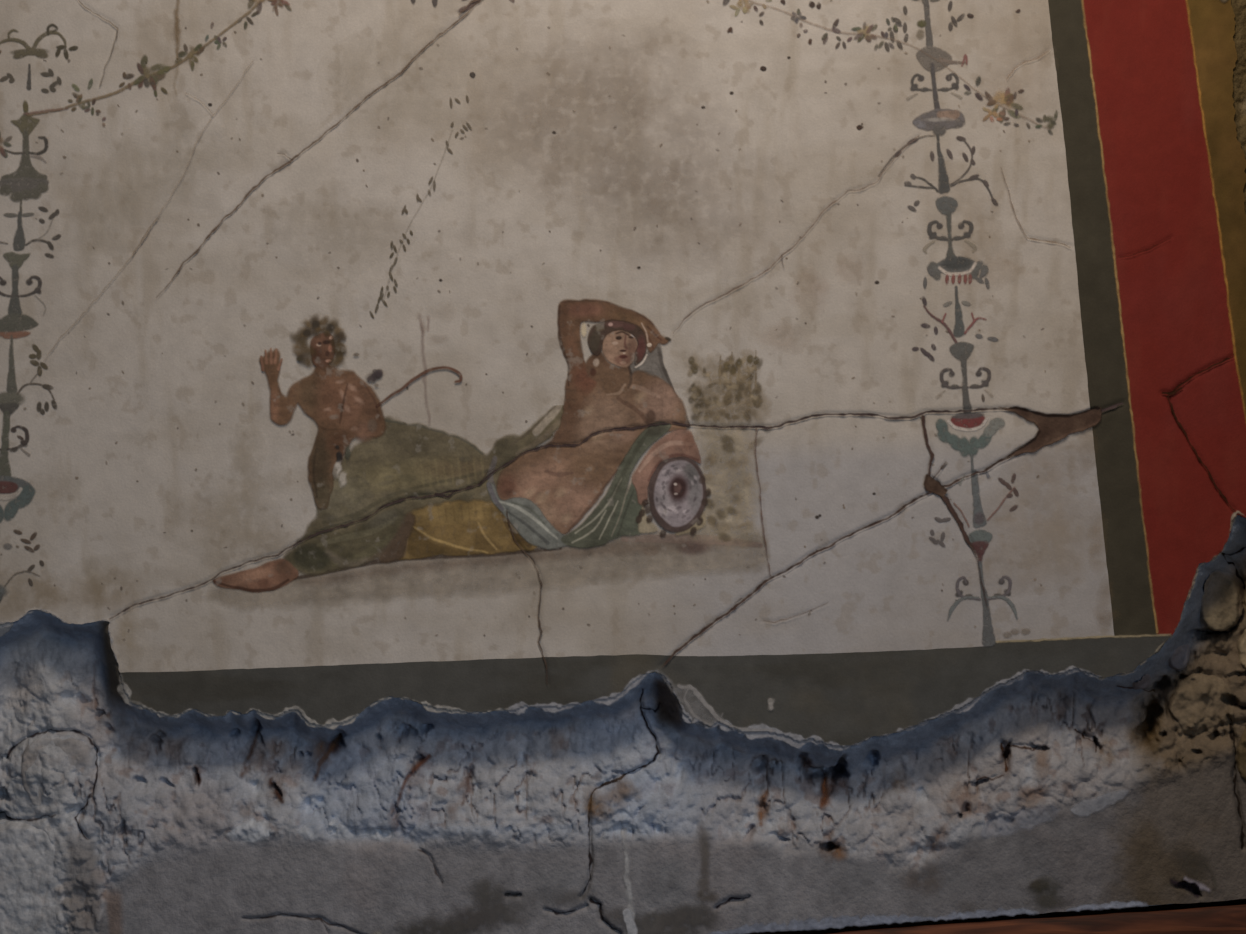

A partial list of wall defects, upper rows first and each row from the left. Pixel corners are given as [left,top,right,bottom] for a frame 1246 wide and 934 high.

spalling [0,511,1246,934]